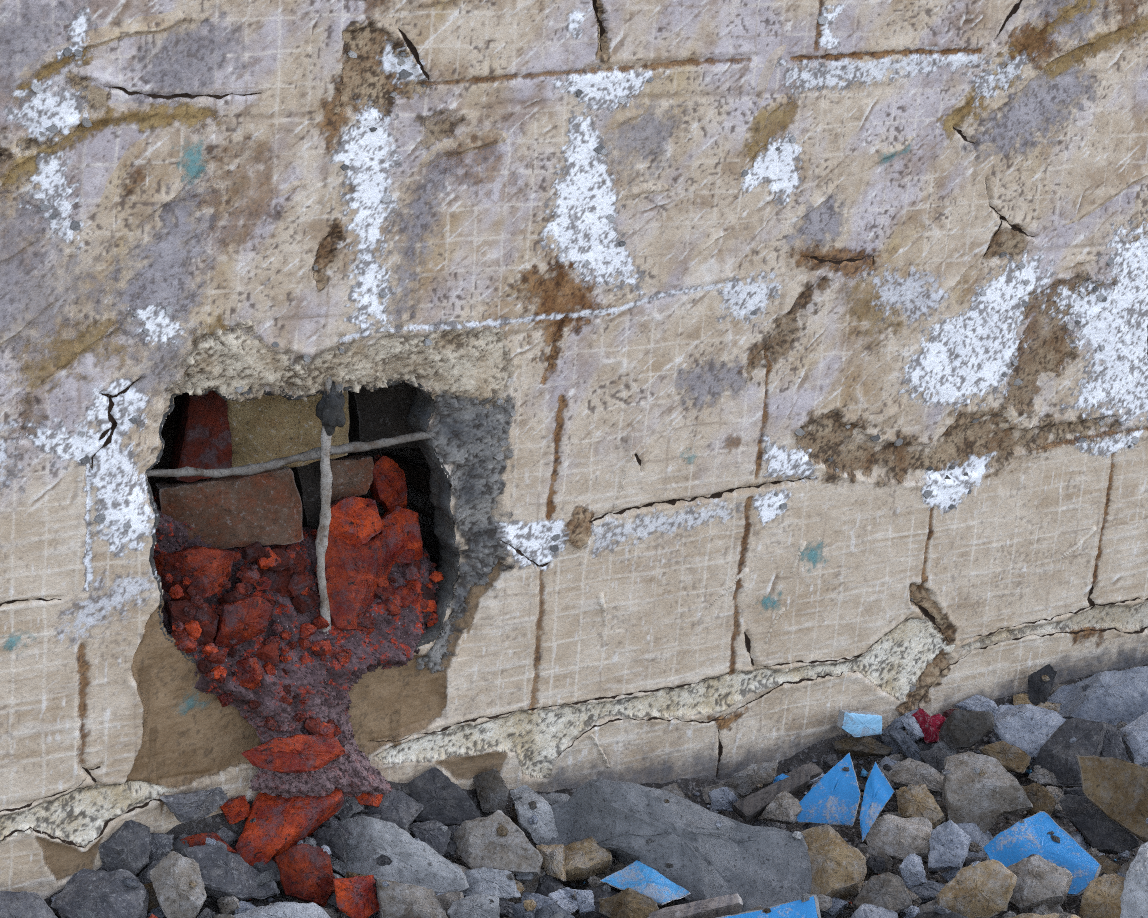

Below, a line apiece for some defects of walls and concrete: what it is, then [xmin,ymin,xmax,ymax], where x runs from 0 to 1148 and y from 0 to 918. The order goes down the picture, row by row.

crack [997,0,1022,36]
crack [105,86,262,100]
crack [983,184,1035,257]
peeling [0,0,1148,673]
crack [91,378,140,470]
crack [500,540,550,567]
crack [0,598,61,606]
crack [370,586,1148,775]
crack [0,766,186,848]